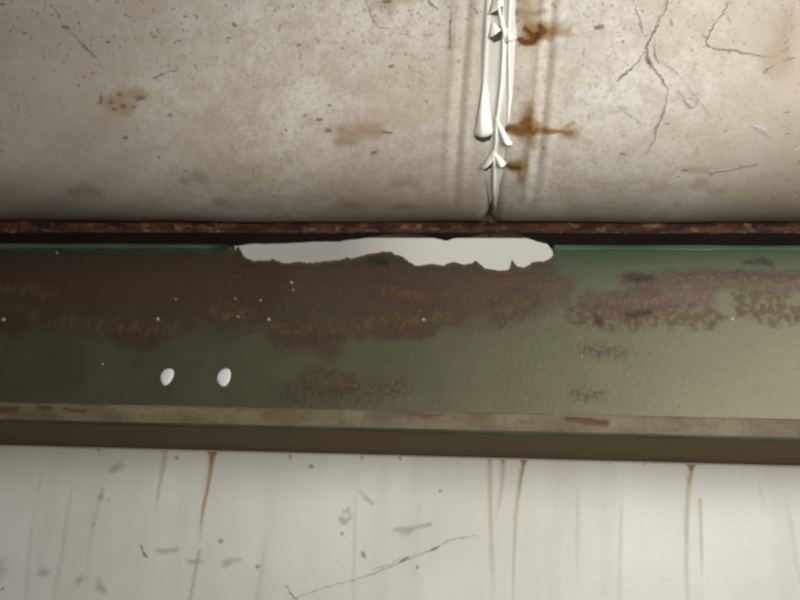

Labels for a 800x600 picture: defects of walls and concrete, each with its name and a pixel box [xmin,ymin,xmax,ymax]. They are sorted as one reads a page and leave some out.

rust [516,3,566,45]
crack [706,3,767,73]
crack [617,10,703,145]
rust [505,106,575,146]
rust [507,154,527,182]
rust [230,247,571,356]
rust [203,452,217,511]